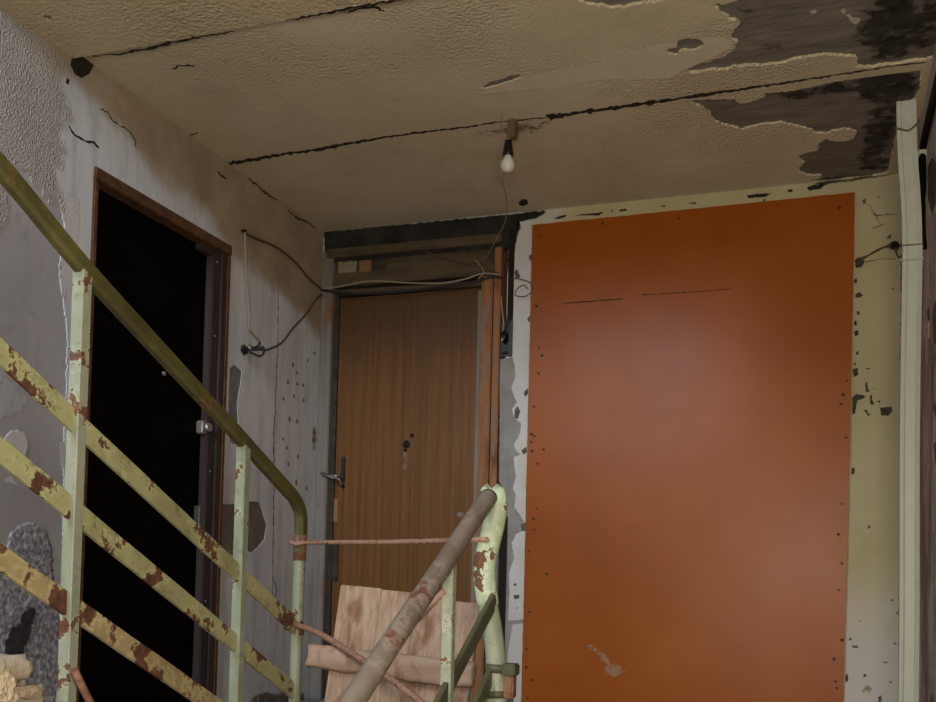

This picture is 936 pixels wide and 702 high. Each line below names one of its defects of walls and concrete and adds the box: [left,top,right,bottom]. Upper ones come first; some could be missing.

crack [92,31,234,70]
crack [285,0,399,21]
spalling [688,0,936,71]
mould [856,0,936,59]
crack [69,126,99,148]
crack [101,108,137,148]
crack [218,62,926,229]
spalling [692,70,921,191]
leakage [785,73,918,186]
flaking render [0,189,68,398]
flaking render [0,368,64,488]
flaking render [499,358,528,663]